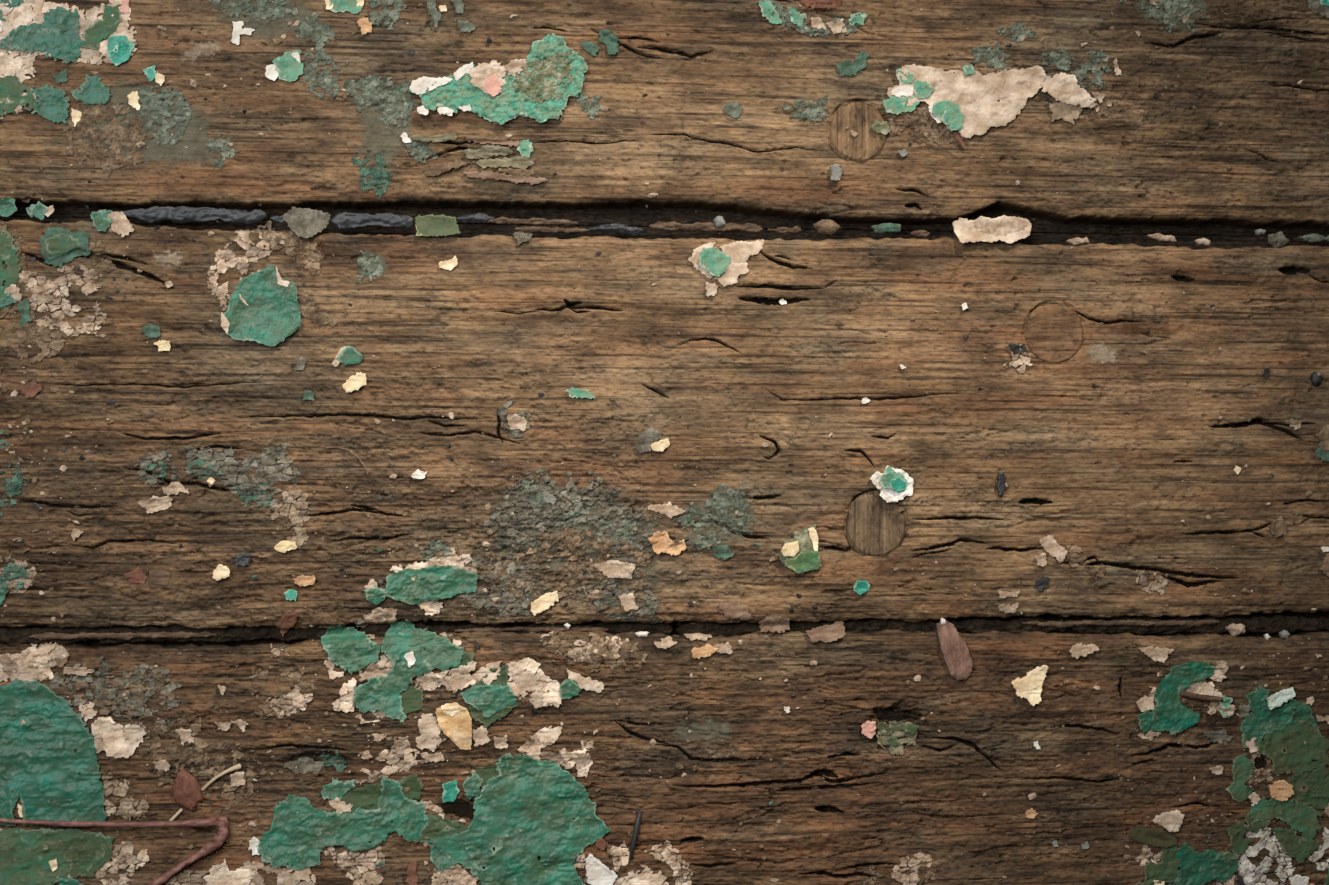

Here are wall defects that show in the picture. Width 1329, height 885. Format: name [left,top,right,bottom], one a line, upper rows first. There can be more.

peeling [0,0,165,127]
peeling [871,42,1112,157]
peeling [0,197,134,364]
peeling [207,207,348,347]
peeling [415,214,461,237]
peeling [688,239,764,297]
peeling [332,346,366,393]
peeling [134,444,317,553]
peeling [165,468,735,885]
peeling [806,621,845,643]
peeling [0,642,317,885]
peeling [1135,646,1329,885]